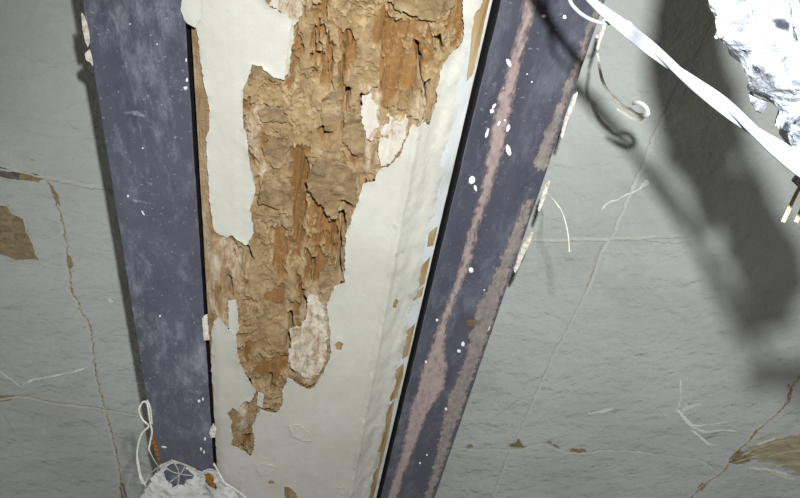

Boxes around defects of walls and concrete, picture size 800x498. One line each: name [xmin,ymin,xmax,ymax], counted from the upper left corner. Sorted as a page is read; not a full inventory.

peeling [249,64,282,86]
peeling [258,105,288,123]
peeling [342,111,366,157]
peeling [257,134,292,211]
spalling [0,205,40,262]
crack [451,21,800,498]
crack [0,167,139,498]
peeling [202,314,210,340]
peeling [369,324,415,498]